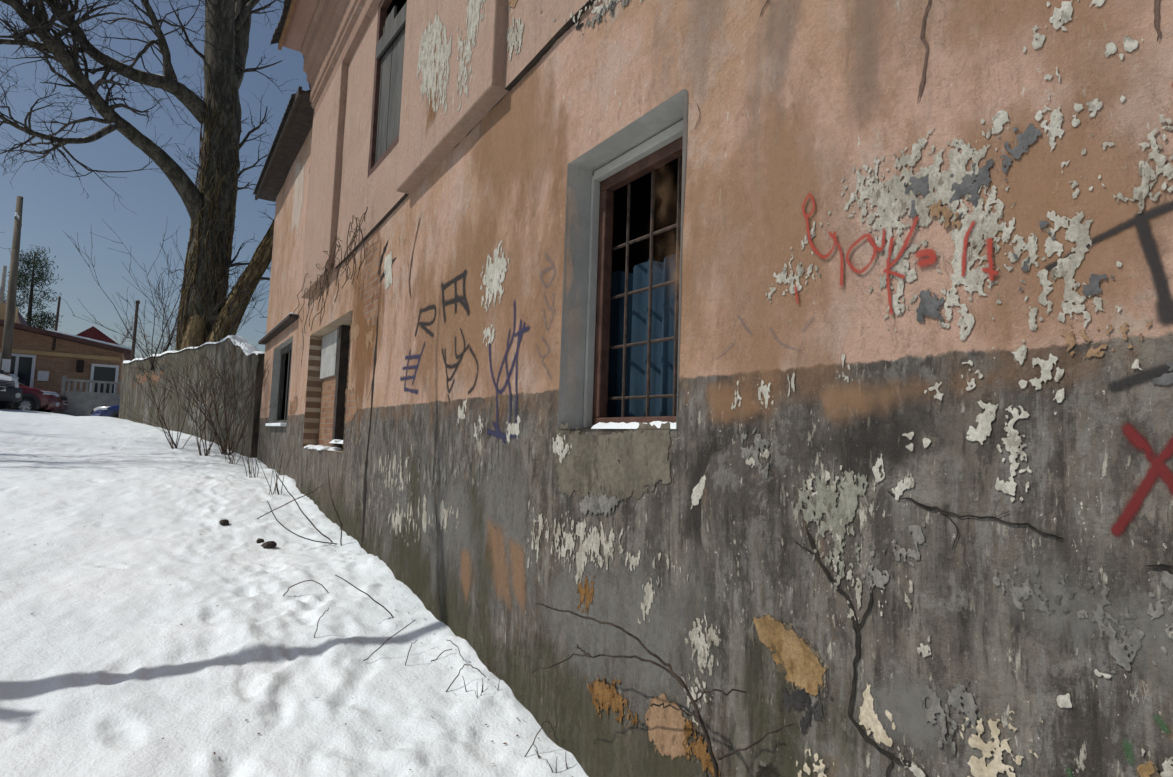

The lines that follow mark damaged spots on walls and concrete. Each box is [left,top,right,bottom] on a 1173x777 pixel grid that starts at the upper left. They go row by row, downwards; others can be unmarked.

crack [917,0,943,101]
peeling [841,67,1173,403]
leakage [383,451,534,660]
leakage [549,553,707,701]
flaking render [583,611,729,777]
leakage [687,446,717,542]
flaking render [753,614,833,701]
crack [794,526,929,777]
peeling [859,678,1038,777]
crack [886,490,1064,550]
peeling [961,360,1032,502]
crack [1147,564,1173,572]